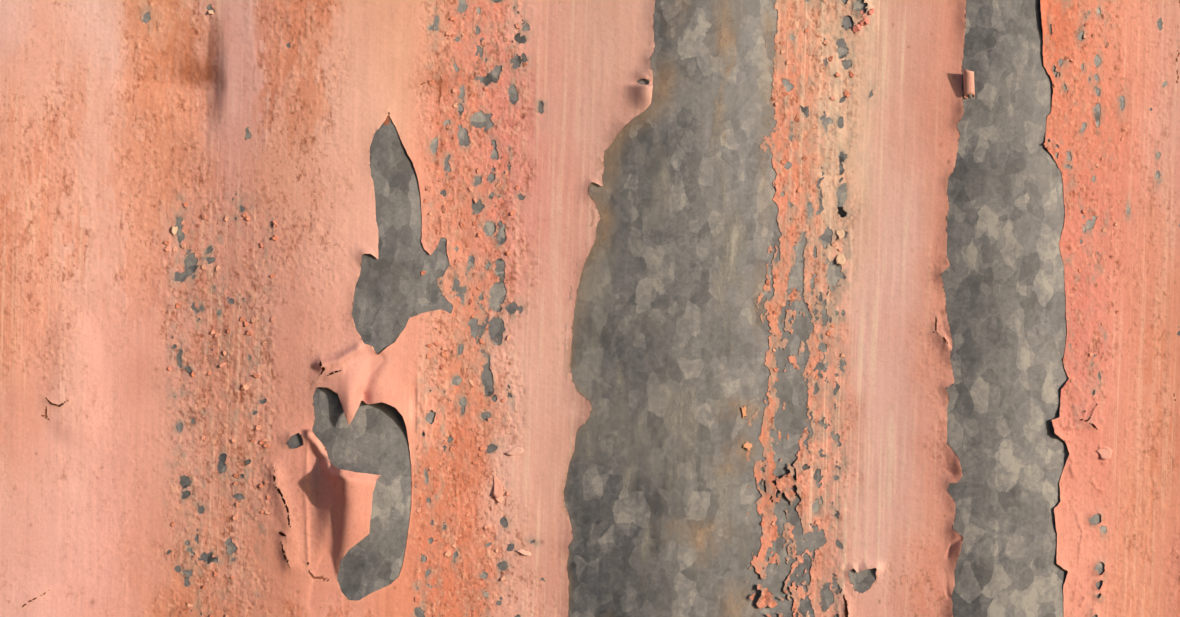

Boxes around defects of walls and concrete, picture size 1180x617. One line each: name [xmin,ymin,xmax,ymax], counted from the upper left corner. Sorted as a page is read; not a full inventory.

spalling [428,0,530,180]
spalling [352,118,525,369]
spalling [167,317,265,397]
peeling [430,376,512,422]
peeling [563,0,884,617]
peeling [941,0,1118,617]
peeling [180,475,205,514]
peeling [217,438,251,521]
spalling [287,386,440,600]
peeling [167,529,237,589]
spalling [414,520,447,617]
peeling [481,540,535,605]